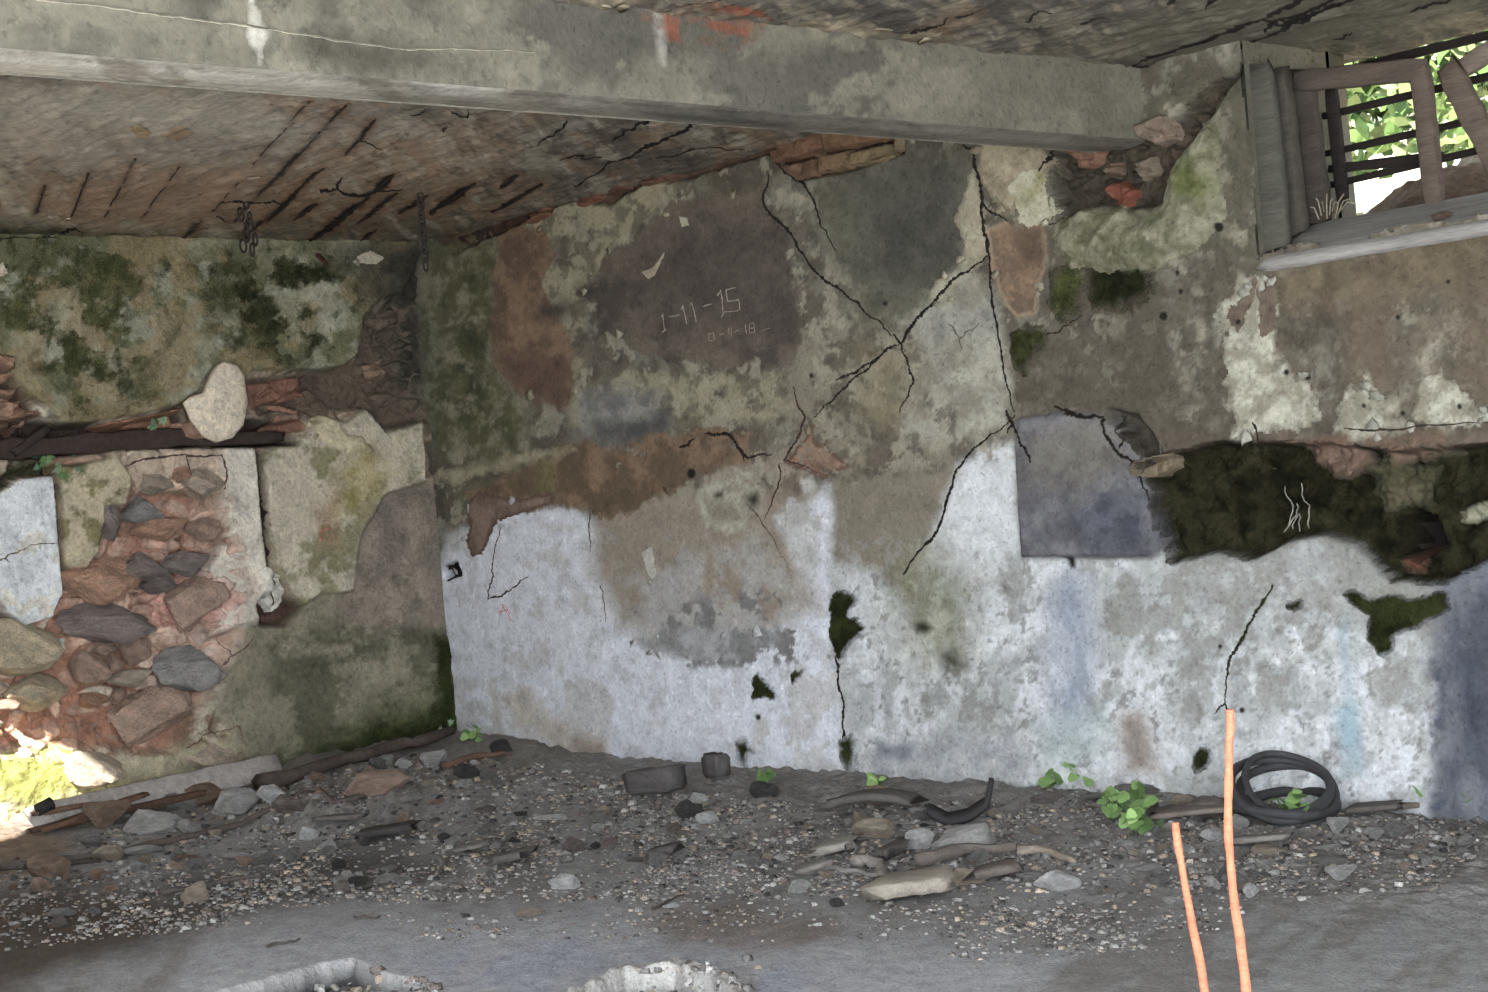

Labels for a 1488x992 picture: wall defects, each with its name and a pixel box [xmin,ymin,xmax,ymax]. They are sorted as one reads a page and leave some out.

crack [1132,0,1354,69]
flaking render [933,77,1239,320]
spalling [0,315,413,463]
damp [304,430,405,555]
damp [346,226,680,481]
flaking render [335,423,851,647]
crack [536,121,1031,575]
flaking render [1114,268,1488,586]
damp [271,667,437,766]
crack [834,657,846,738]
crack [1214,584,1273,714]
damp [1421,571,1488,822]